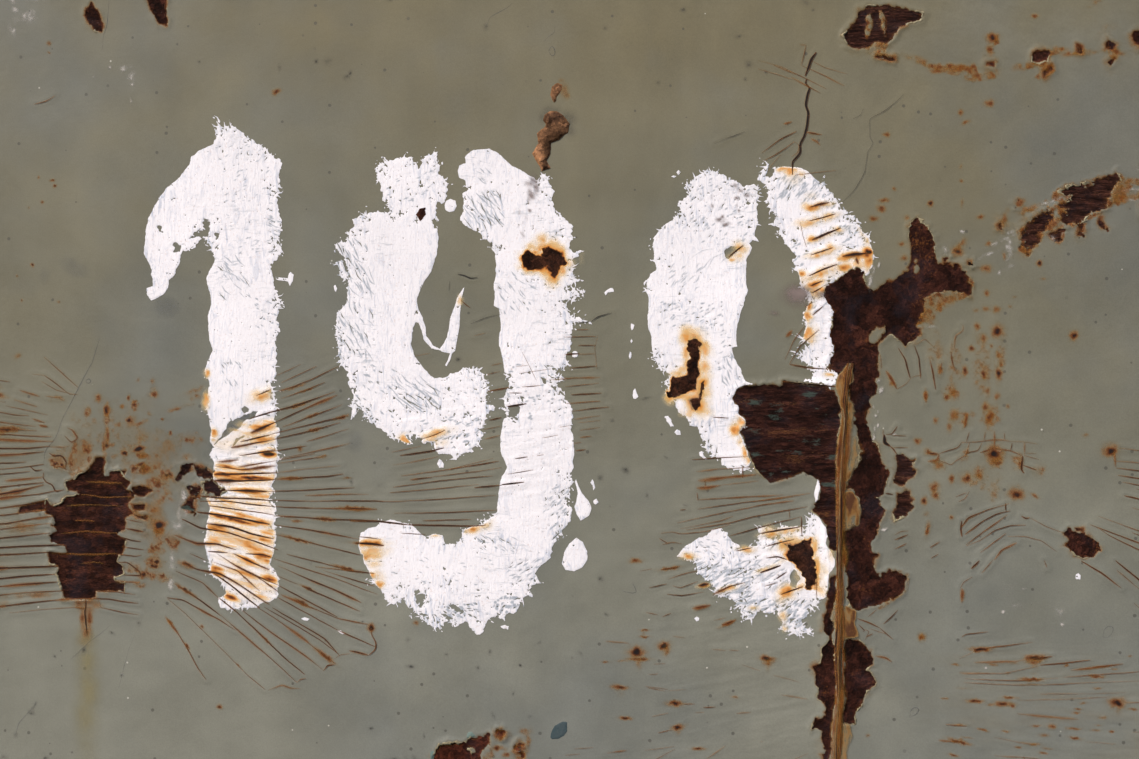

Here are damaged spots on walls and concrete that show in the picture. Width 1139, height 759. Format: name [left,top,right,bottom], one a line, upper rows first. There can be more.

rust [83,2,104,33]
rust [147,0,168,26]
rust [841,4,924,62]
rust [1020,43,1083,79]
rust [532,83,570,171]
rust [996,173,1139,266]
rust [519,236,568,283]
rust [665,330,709,416]
rust [730,204,1021,759]
rust [18,395,302,636]
rust [1064,527,1101,559]
rust [433,729,524,759]